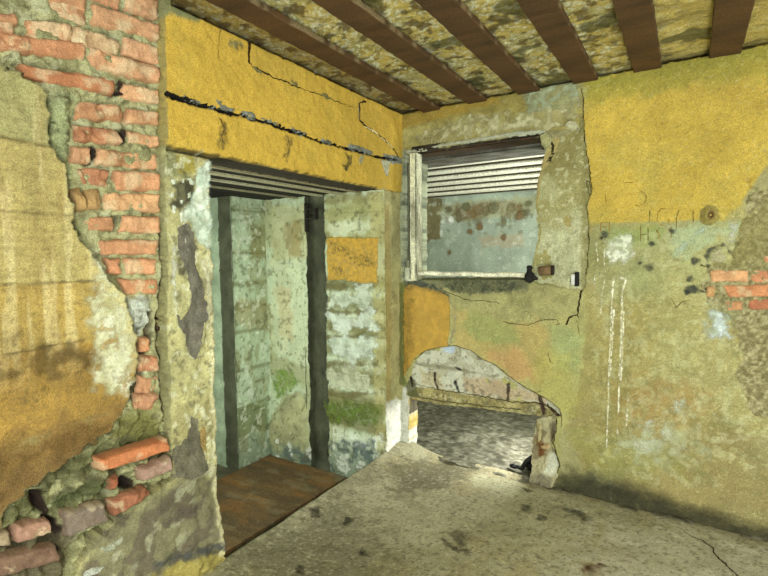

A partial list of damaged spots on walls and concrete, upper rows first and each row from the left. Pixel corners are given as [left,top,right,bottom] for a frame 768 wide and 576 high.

crack [164,43,402,165]
flaking render [0,0,212,576]
spalling [403,284,561,488]
crack [440,88,592,332]
leakage [594,277,686,462]
flaking render [685,189,768,419]
crack [684,531,738,576]